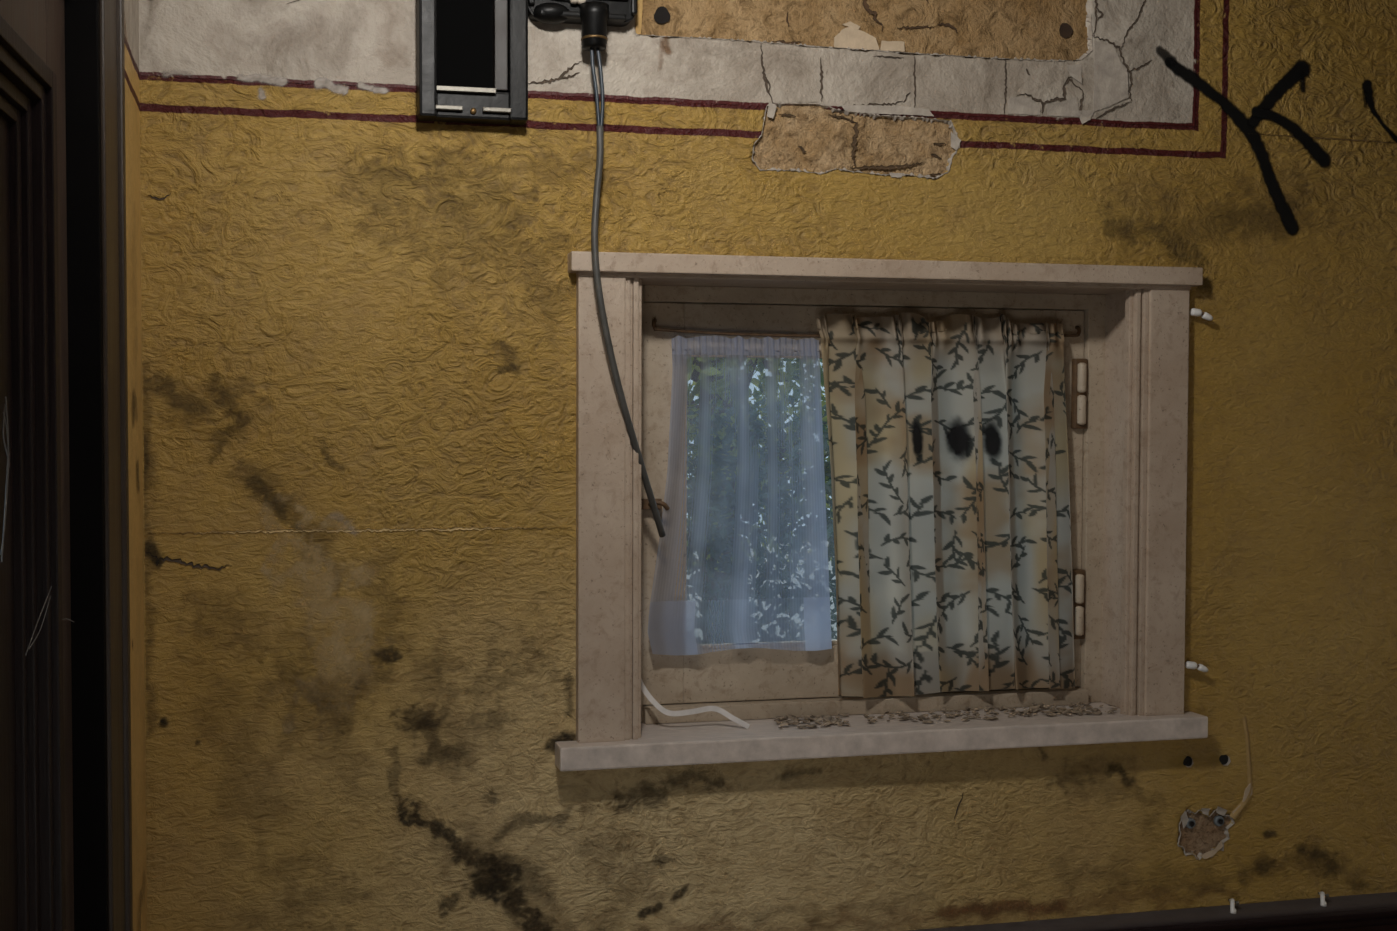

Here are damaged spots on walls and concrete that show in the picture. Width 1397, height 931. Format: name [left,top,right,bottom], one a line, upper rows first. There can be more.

crack [760,47,774,104]
flaking render [635,0,1093,62]
crack [820,54,916,108]
crack [1003,0,1151,124]
flaking render [752,102,961,180]
damp [546,732,575,751]
flaking render [1177,783,1252,860]
damp [399,798,551,931]
damp [942,900,1064,917]